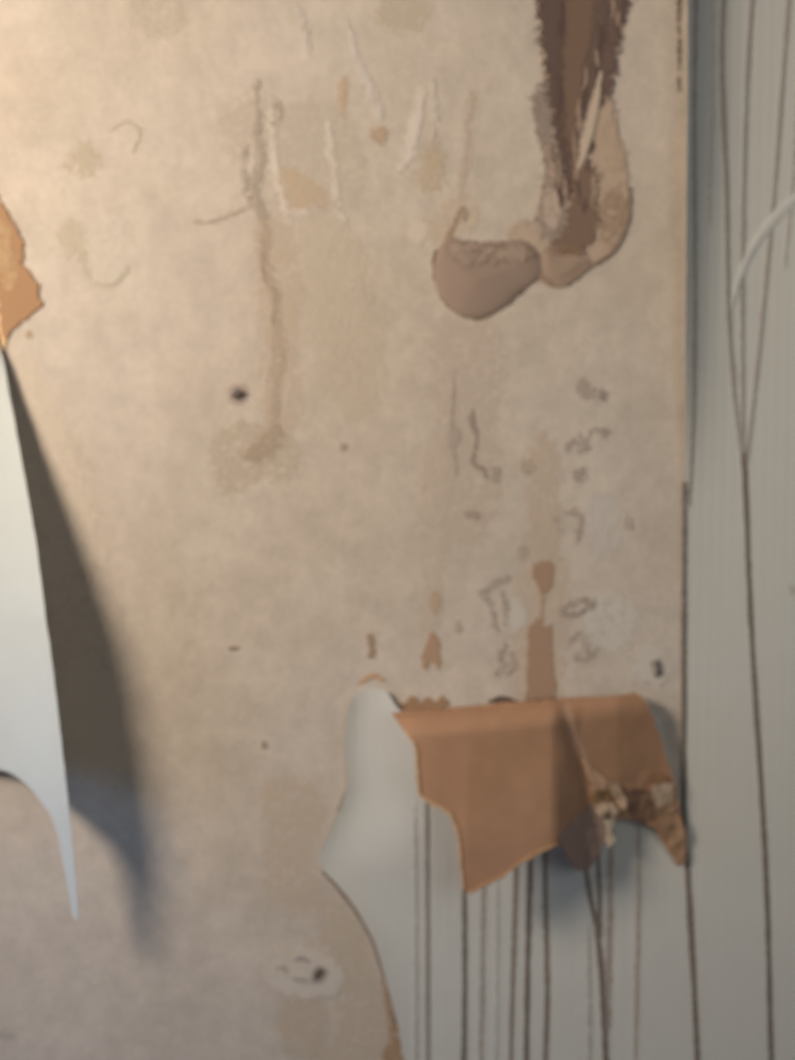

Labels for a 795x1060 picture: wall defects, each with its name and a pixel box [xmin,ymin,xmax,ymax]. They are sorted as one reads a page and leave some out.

water stain [505,0,632,288]